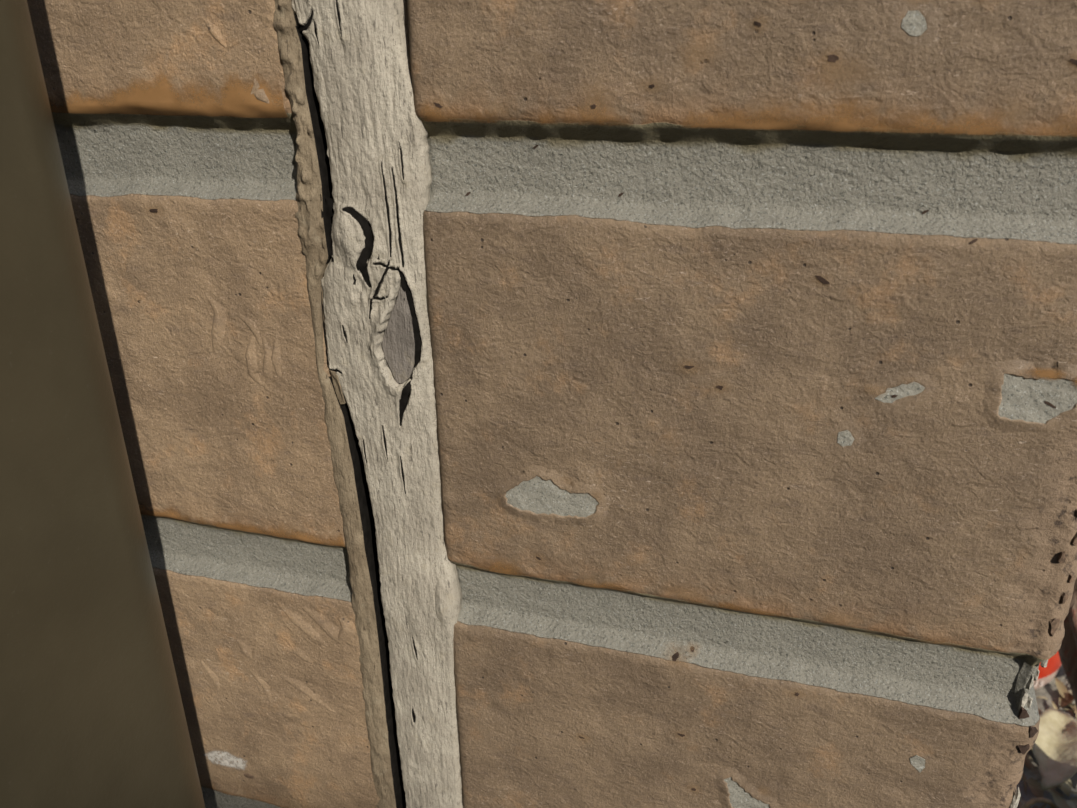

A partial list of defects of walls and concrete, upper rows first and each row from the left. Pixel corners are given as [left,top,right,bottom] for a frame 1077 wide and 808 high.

peeling [884,0,945,48]
rust [49,76,289,118]
rust [684,104,1010,135]
crack [292,0,404,319]
peeling [865,371,940,414]
peeling [982,359,1077,437]
peeling [494,464,612,526]
crack [321,292,418,808]
peeling [716,768,780,808]